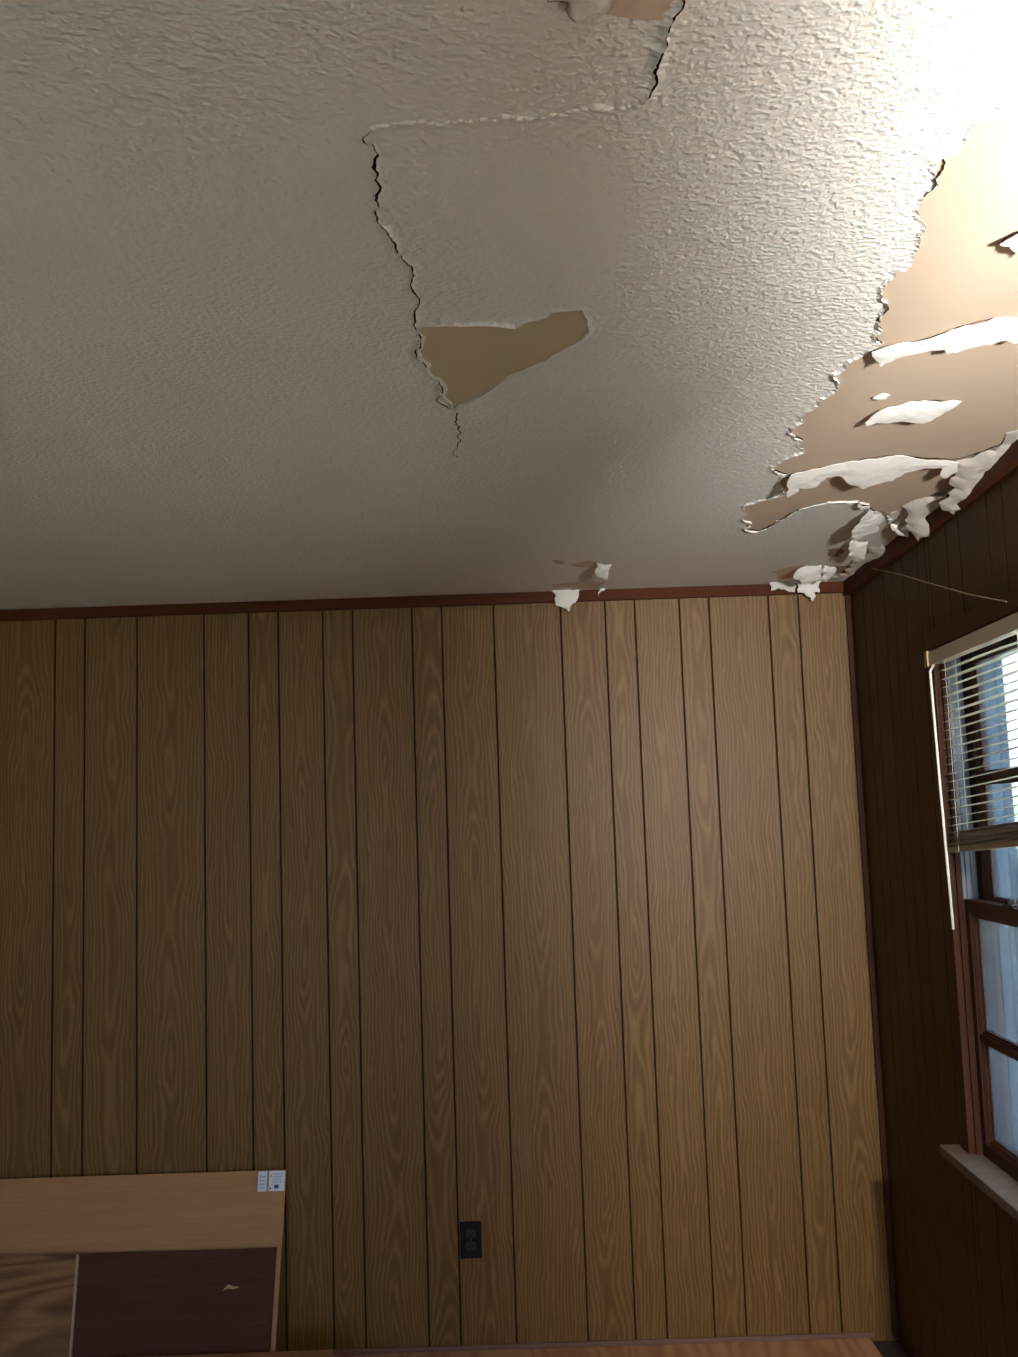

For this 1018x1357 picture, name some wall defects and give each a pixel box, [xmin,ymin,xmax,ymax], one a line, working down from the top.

peeling [547,0,676,22]
crack [349,0,696,456]
peeling [413,306,596,411]
peeling [740,71,1018,601]
peeling [551,560,612,612]